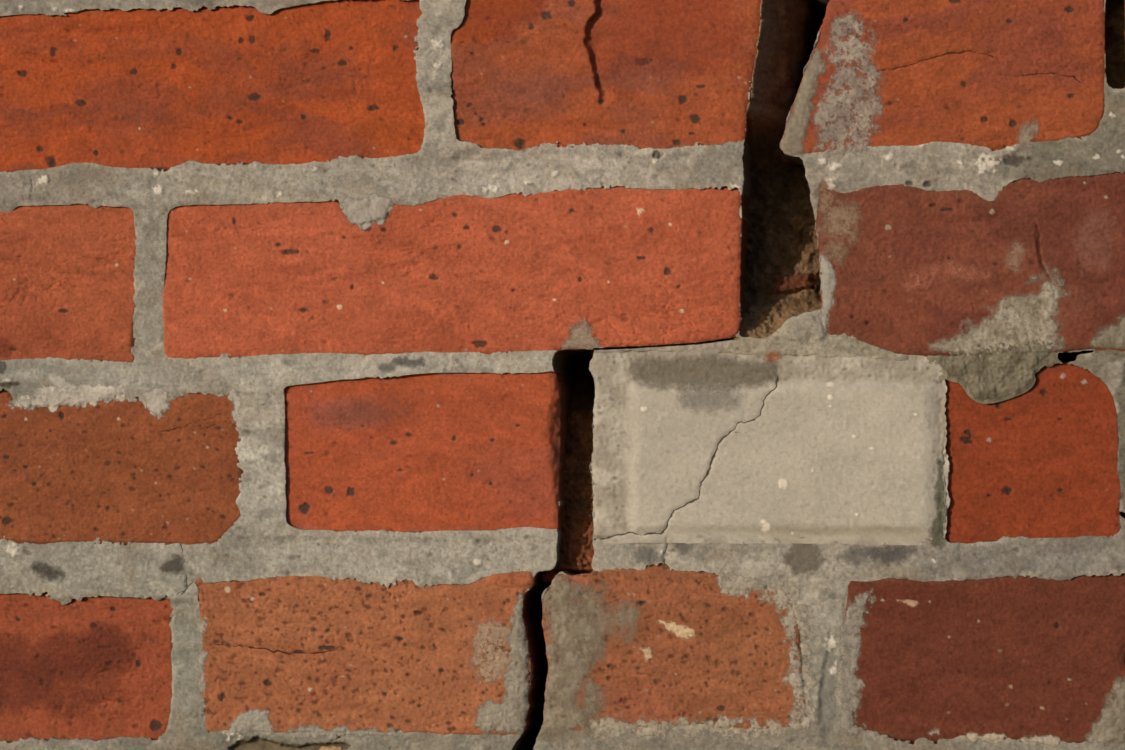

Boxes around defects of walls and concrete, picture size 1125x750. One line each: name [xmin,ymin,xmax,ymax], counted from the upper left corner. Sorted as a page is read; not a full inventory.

crack [541,0,823,583]
damp [780,13,883,156]